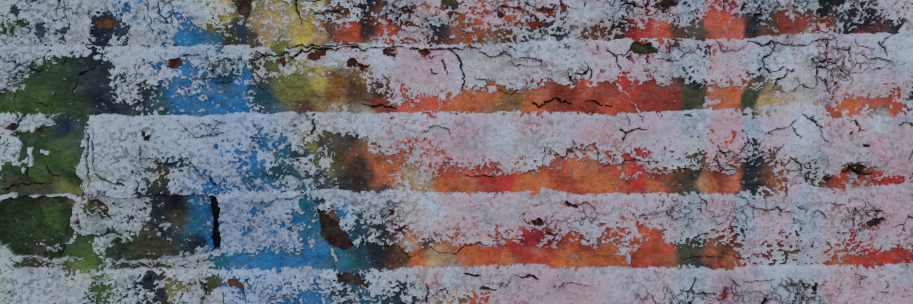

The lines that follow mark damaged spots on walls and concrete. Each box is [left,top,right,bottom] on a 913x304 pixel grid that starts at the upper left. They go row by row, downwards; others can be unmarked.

peeling [28,28,47,42]
flaking render [96,18,117,29]
peeling [151,19,239,69]
crack [250,0,466,91]
crack [606,47,635,71]
peeling [237,0,794,220]
crack [532,62,649,142]
crack [715,33,896,171]
spalling [0,48,822,304]
crack [841,162,872,177]
crack [792,201,913,232]
crack [647,251,752,304]